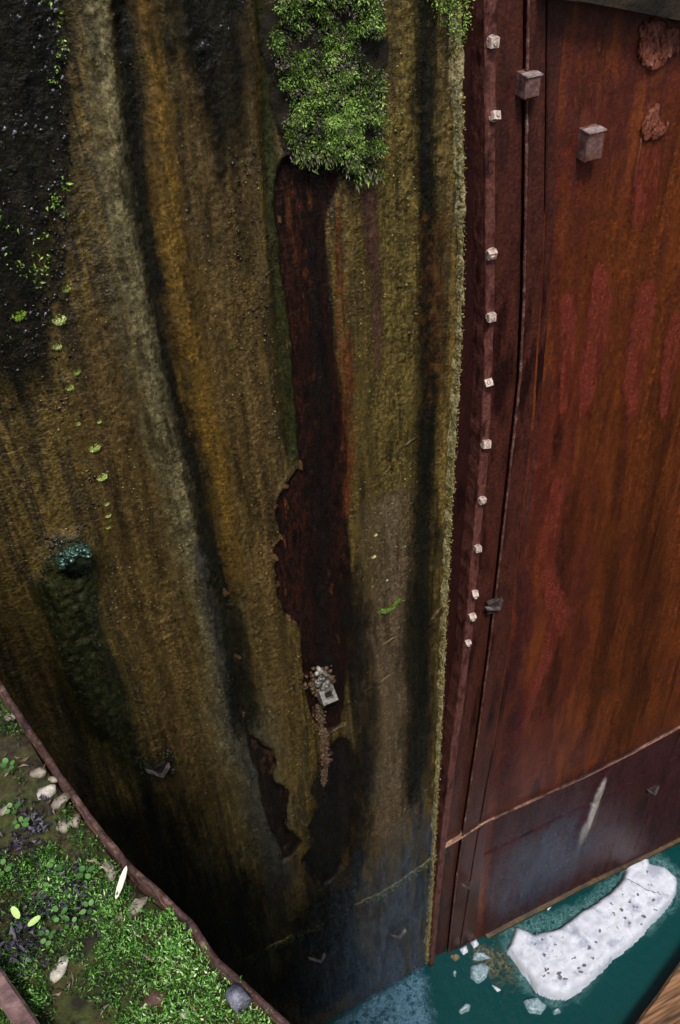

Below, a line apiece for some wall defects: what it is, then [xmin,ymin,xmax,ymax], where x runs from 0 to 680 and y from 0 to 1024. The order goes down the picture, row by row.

corrosion [639,16,680,70]
corrosion [634,103,669,187]
peeling [271,149,350,732]
leakage [0,0,442,1022]
peeling [246,731,303,858]